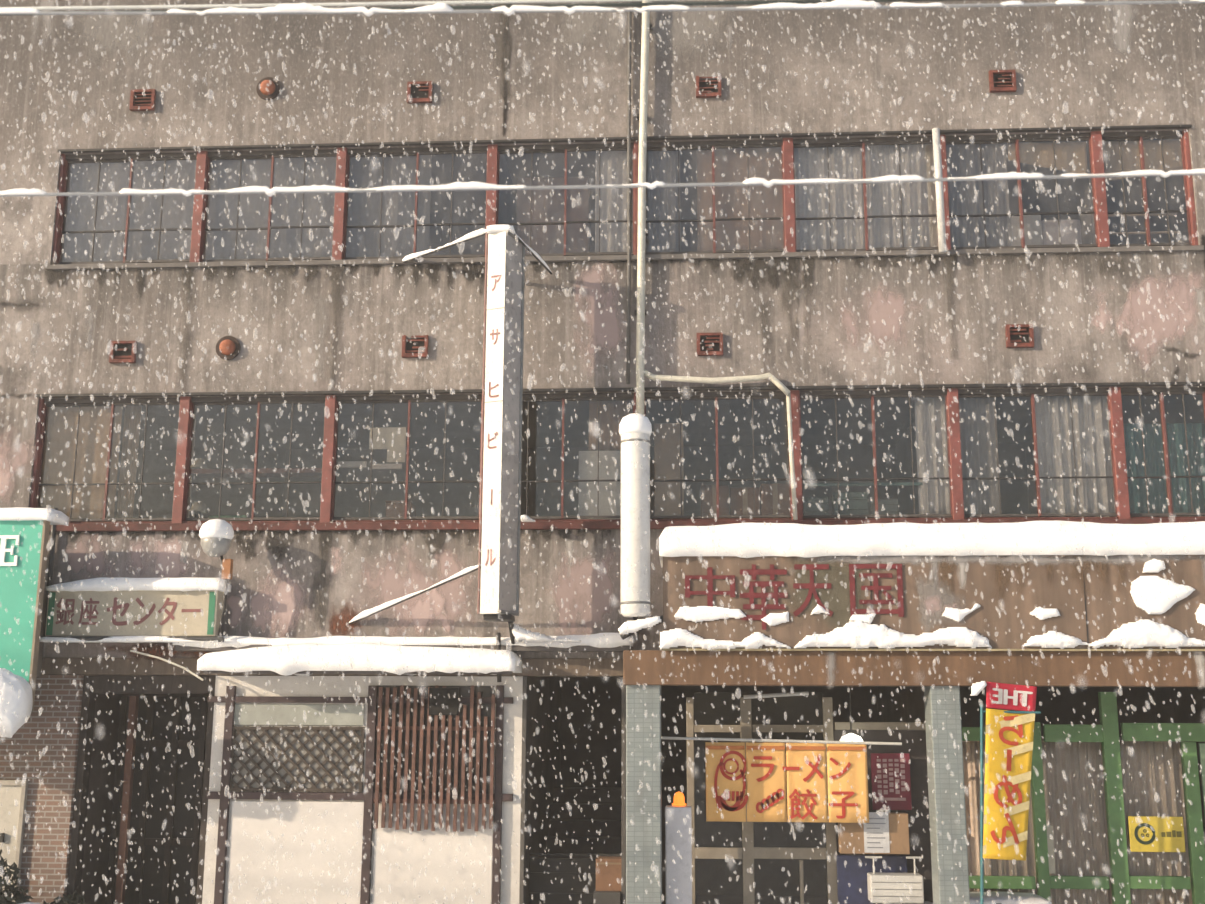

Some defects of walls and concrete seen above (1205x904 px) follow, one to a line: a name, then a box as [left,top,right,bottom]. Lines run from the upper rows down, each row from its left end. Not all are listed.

damp [1106,0,1133,52]